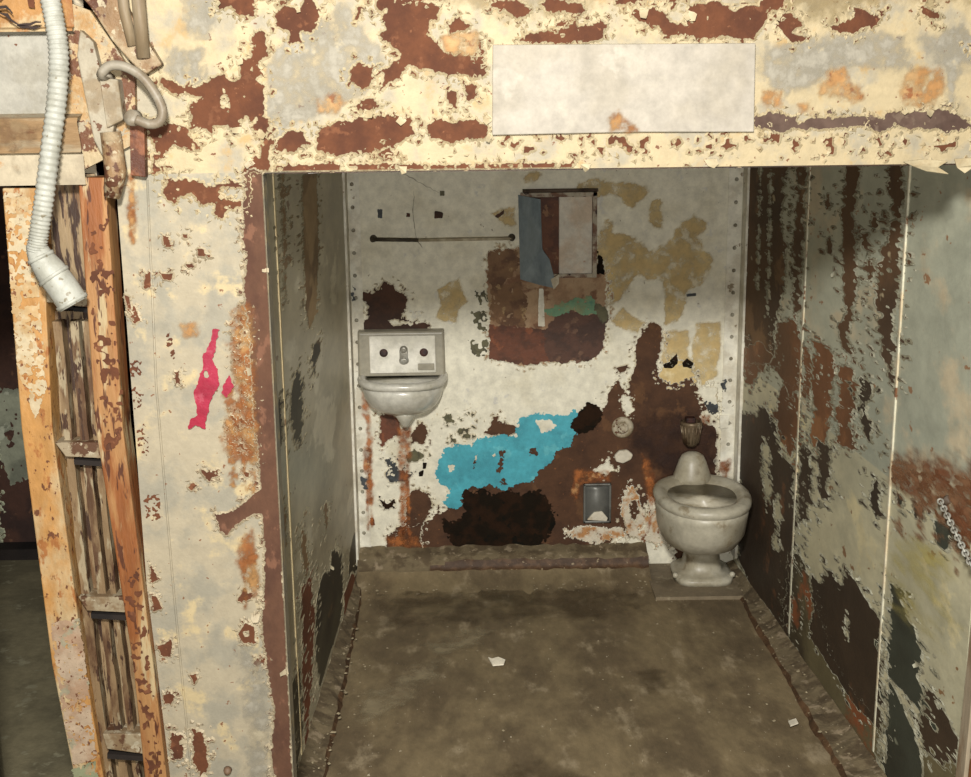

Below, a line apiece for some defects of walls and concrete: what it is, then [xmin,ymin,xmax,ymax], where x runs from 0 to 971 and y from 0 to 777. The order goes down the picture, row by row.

peeling [88,0,908,482]
peeling [0,192,47,542]
peeling [51,618,99,777]
spalling [144,494,161,521]
peeling [124,560,217,777]
spalling [186,463,224,493]
spalling [233,580,255,606]
peeling [283,488,357,770]
rust [210,153,577,777]
peeling [370,318,723,562]
peeling [661,0,971,777]
rust [891,456,971,553]